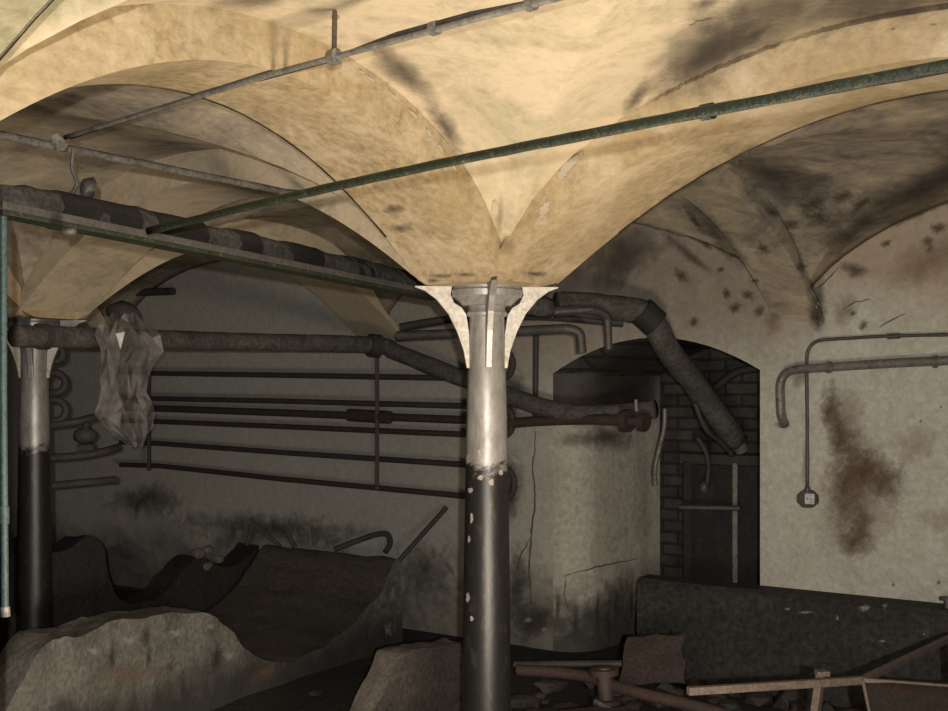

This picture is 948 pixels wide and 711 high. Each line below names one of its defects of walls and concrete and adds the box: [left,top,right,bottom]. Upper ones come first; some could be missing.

water stain [859,167,948,220]
crack [515,431,536,638]
crack [563,559,634,612]